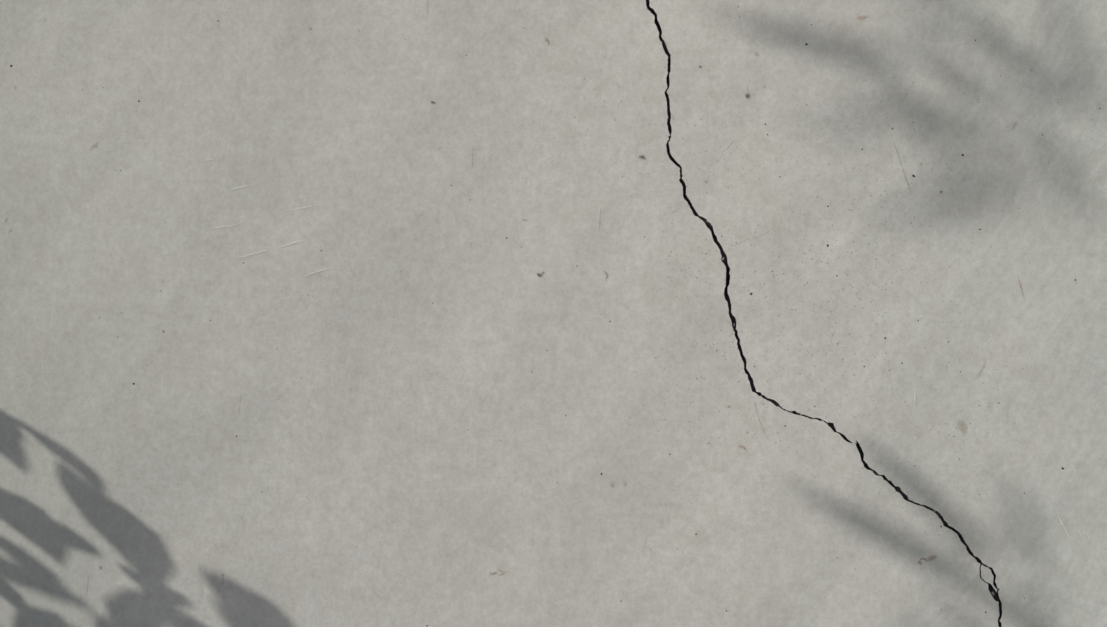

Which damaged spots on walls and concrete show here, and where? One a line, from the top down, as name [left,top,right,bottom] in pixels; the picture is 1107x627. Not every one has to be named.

crack [646,0,1002,627]